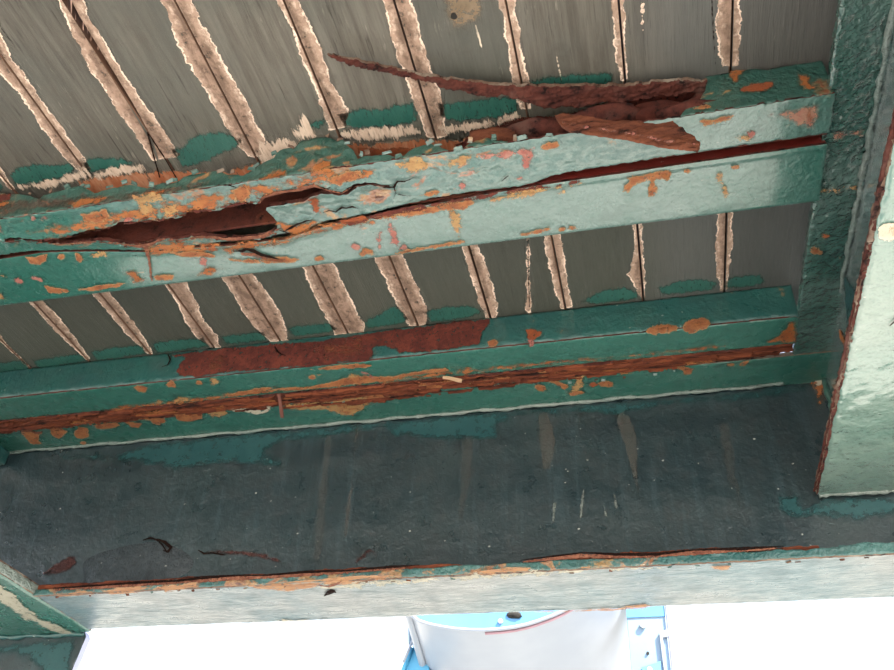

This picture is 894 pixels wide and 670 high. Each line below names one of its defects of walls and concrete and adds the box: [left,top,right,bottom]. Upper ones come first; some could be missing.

rust [729,70,773,92]
rust [799,75,815,89]
rust [780,106,817,127]
crack [280,206,358,235]
crack [233,248,284,262]
rust [810,109,894,495]
rust [0,322,797,445]
crack [143,537,172,553]
crack [523,546,784,563]
peeling [0,585,71,634]